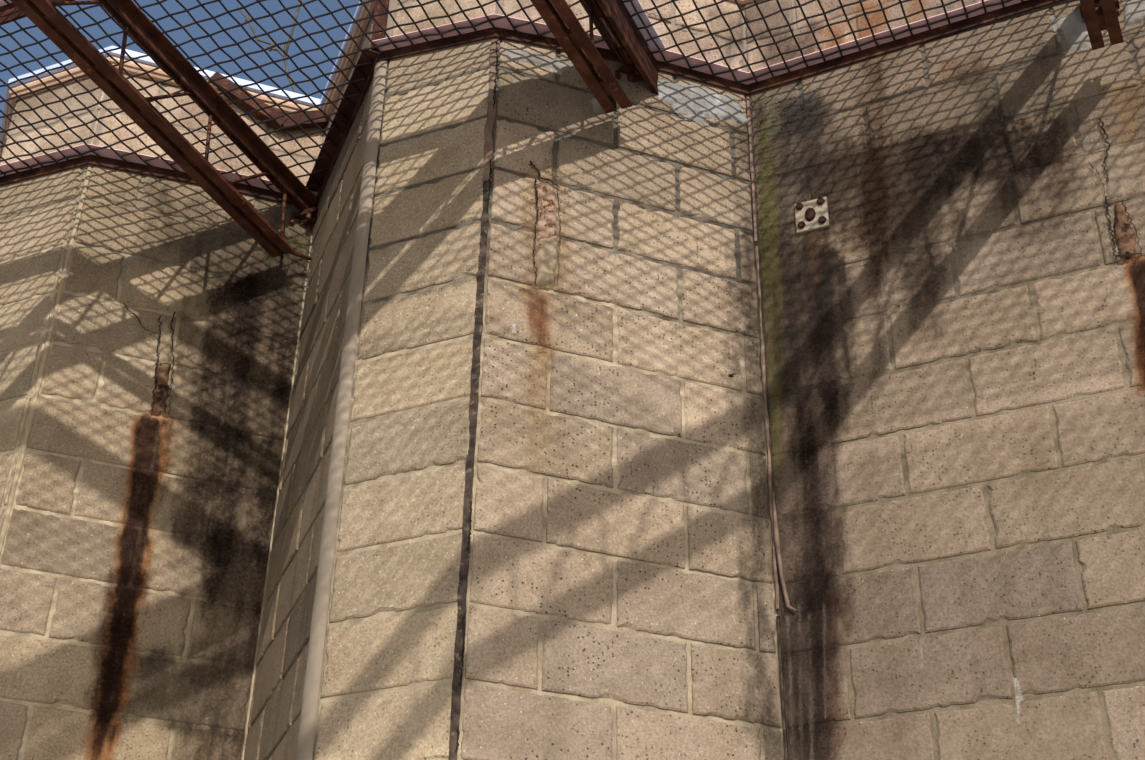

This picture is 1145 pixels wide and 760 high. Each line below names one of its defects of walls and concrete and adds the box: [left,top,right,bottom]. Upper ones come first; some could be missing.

spalling [532,184,561,290]
crack [1089,117,1143,259]
crack [123,303,176,416]
corrosion [1129,259,1145,369]
leakage [183,468,276,518]
corrosion [90,415,161,760]